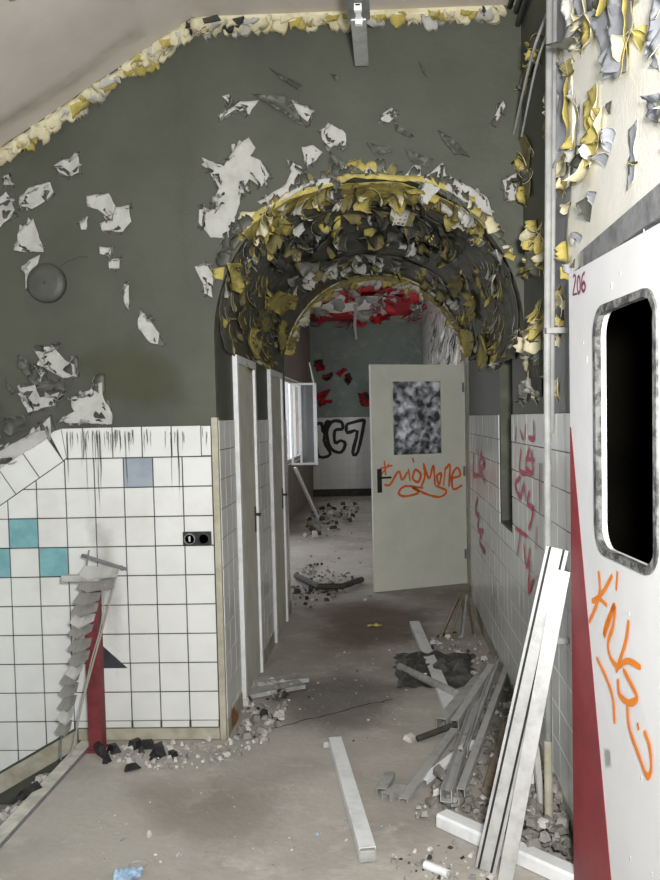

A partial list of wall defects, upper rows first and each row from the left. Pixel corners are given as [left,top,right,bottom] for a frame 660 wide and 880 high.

peeling [0,342,113,469]
peeling [121,281,167,347]
peeling [0,11,351,291]
peeling [195,0,660,409]